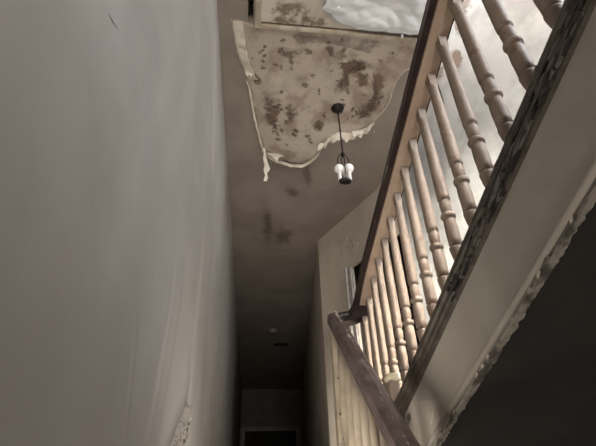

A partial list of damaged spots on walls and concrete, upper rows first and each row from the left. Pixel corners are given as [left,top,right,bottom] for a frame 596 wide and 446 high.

damp [275,3,324,26]
flaking render [230,19,416,181]
spalling [434,184,596,446]